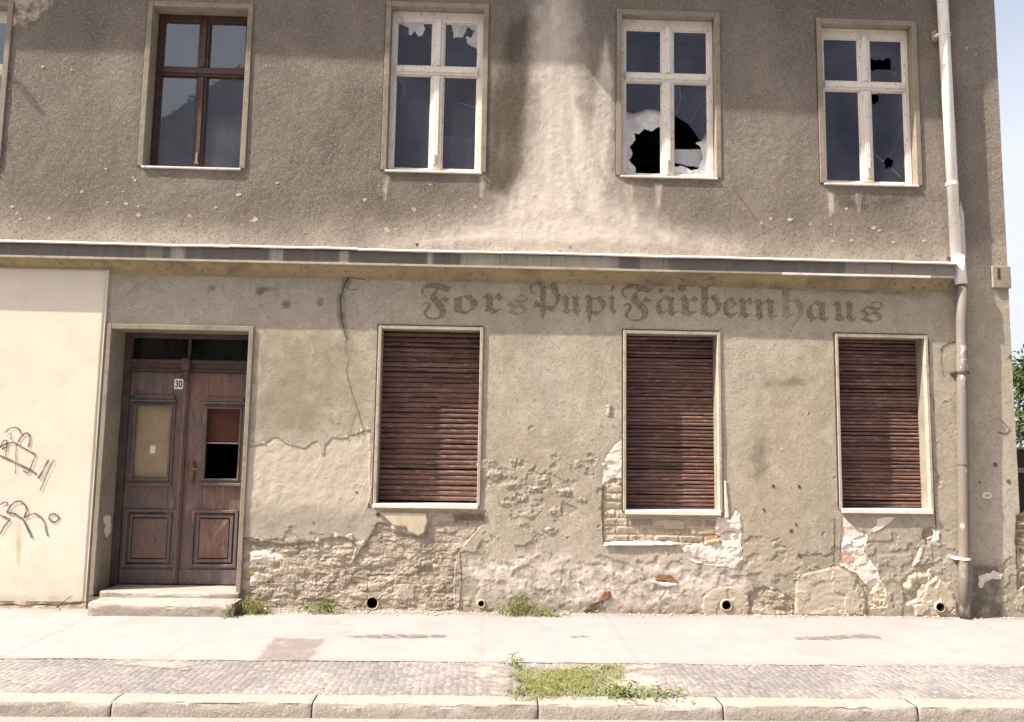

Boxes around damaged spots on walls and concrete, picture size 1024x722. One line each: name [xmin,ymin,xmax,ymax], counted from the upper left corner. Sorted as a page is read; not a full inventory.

water stain [422,0,679,249]
crack [340,277,366,431]
flaking render [240,427,486,612]
flaking render [651,574,678,587]
flaking render [601,438,743,569]
flaking render [837,516,895,609]
flaking render [901,527,946,613]